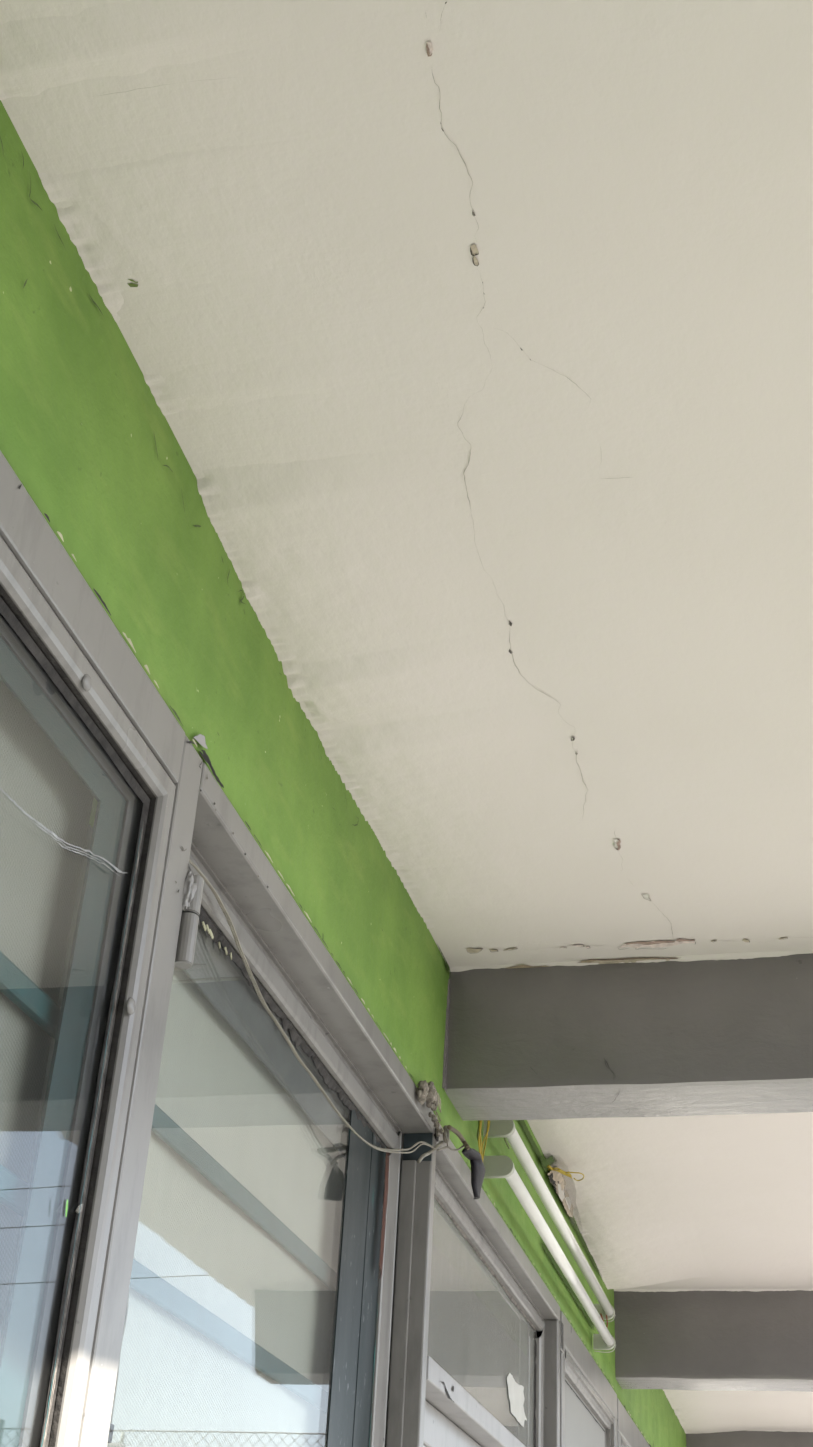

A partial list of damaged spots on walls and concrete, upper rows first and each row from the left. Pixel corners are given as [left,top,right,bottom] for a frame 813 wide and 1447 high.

crack [432,73,479,229]
spalling [467,948,547,969]
peeling [560,938,717,964]